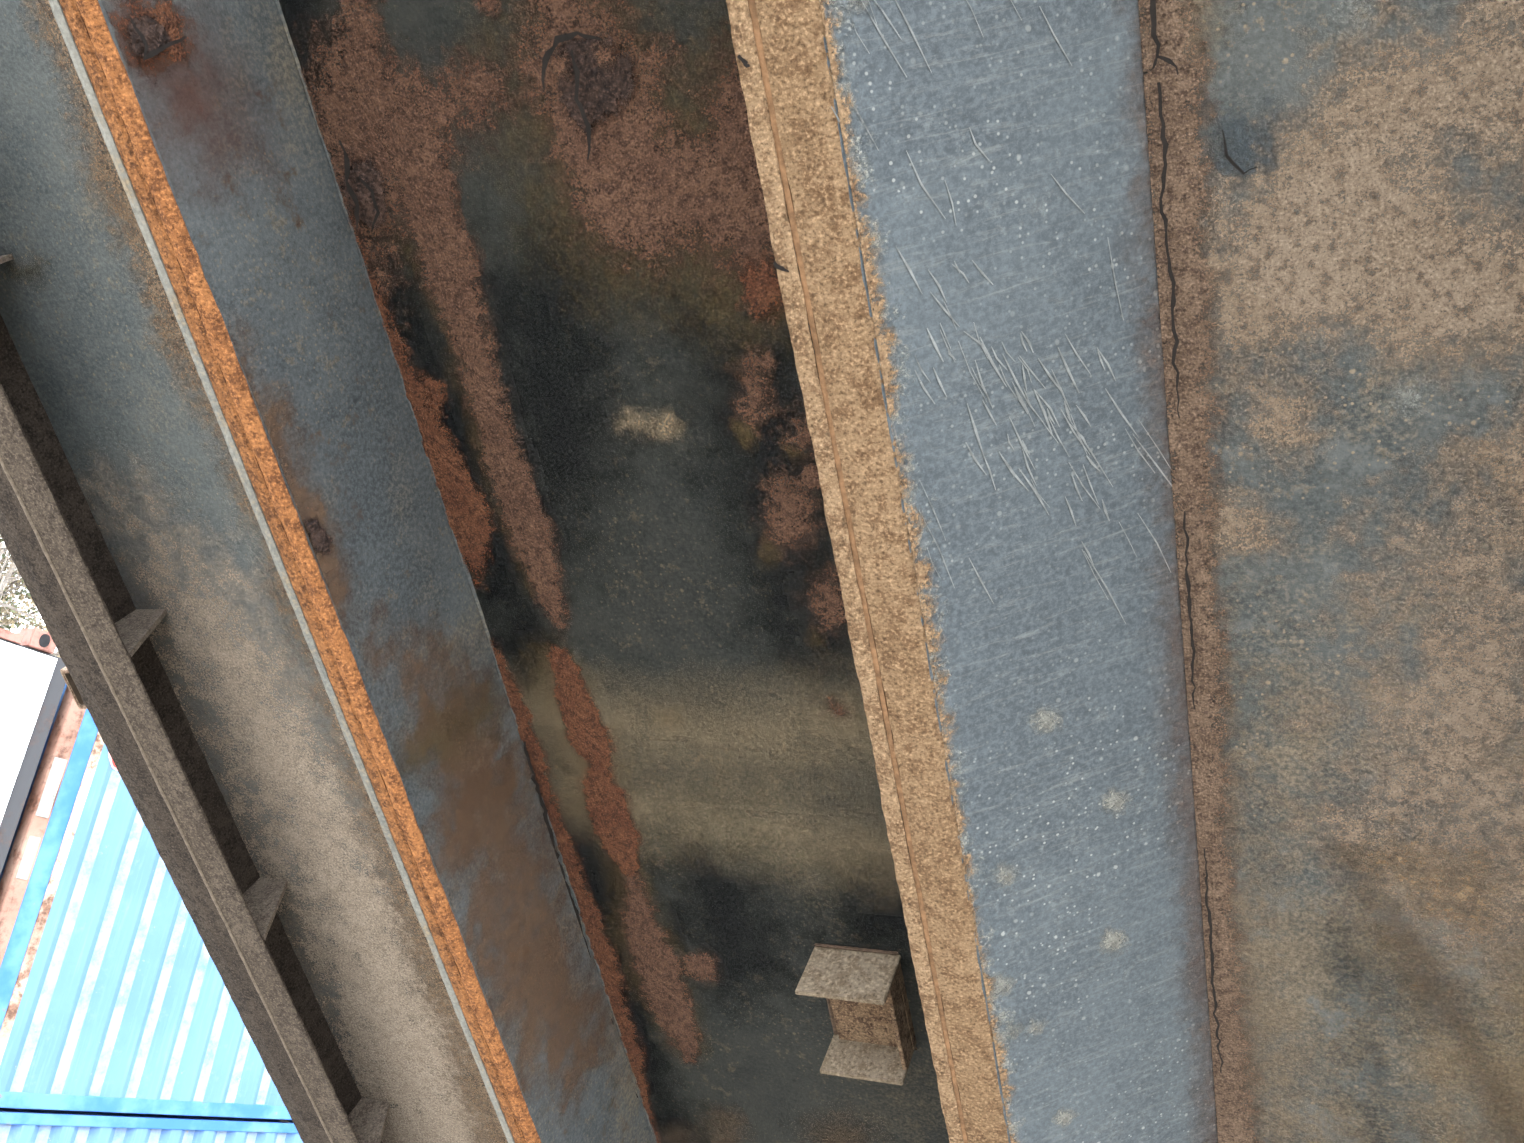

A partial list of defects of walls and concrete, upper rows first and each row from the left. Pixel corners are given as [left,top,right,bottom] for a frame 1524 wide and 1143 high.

corrosion [25,0,508,1143]
corrosion [298,0,849,1143]